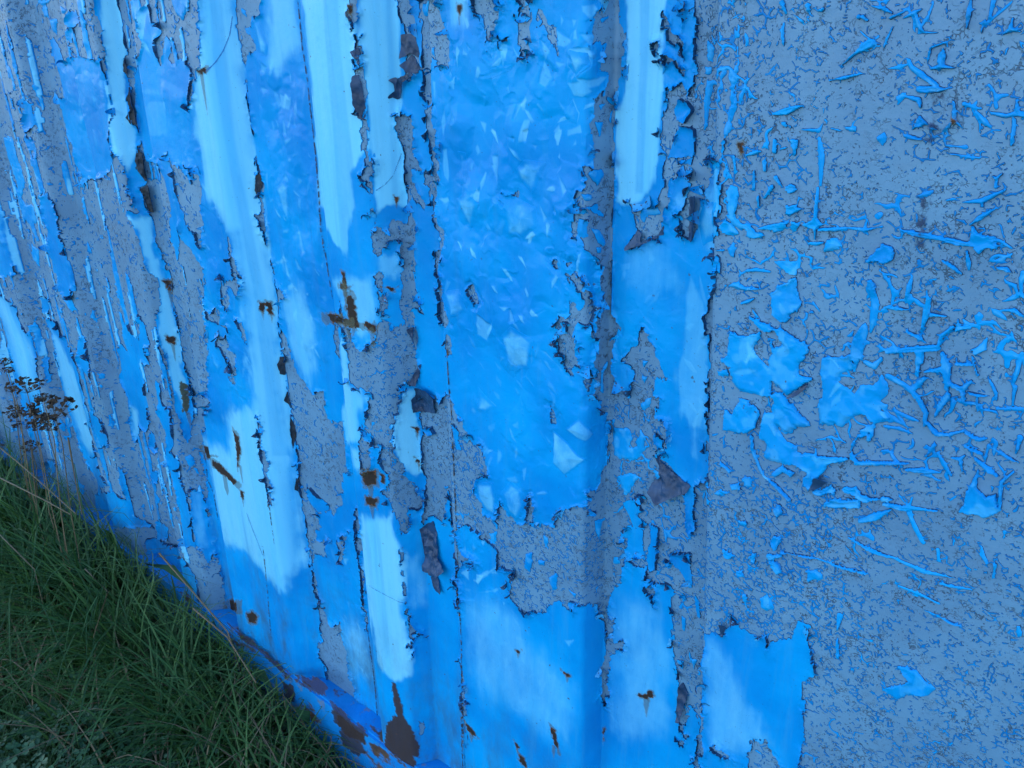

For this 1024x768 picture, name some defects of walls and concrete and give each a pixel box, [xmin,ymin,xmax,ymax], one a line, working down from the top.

peeling [236,0,261,64]
peeling [253,156,267,241]
peeling [0,0,246,610]
corrosion [327,271,376,333]
peeling [277,0,1024,768]
corrosion [204,431,244,499]
peeling [251,414,273,505]
corrosion [360,470,385,506]
corrosion [227,599,368,757]
corrosion [384,682,420,767]